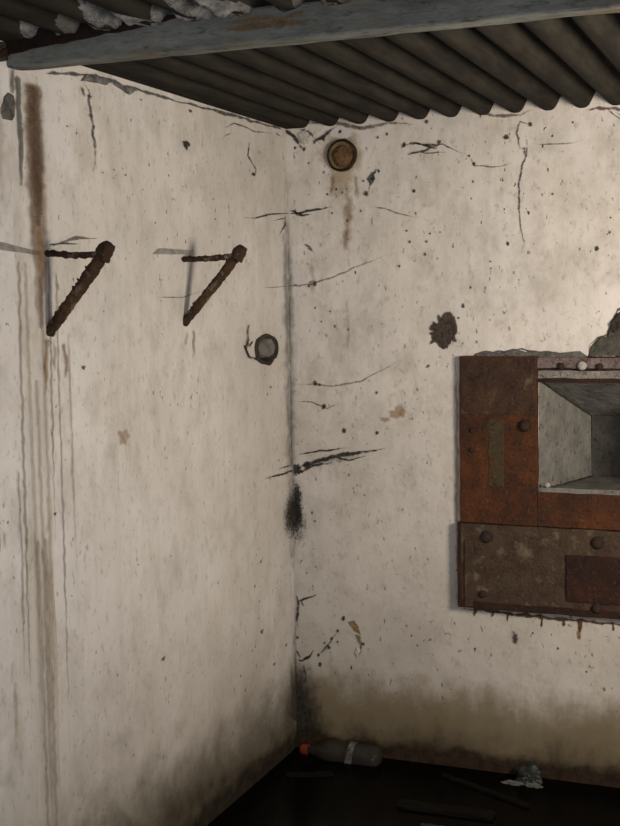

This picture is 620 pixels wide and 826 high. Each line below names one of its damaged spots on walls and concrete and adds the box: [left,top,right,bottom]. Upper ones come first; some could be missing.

water stain [16,77,24,185]
crack [402,121,568,242]
water stain [0,242,35,255]
spalling [474,308,620,358]
crack [269,448,382,478]
water stain [285,484,305,539]
crack [296,595,316,680]
rust [469,608,620,639]
water stain [103,671,620,826]